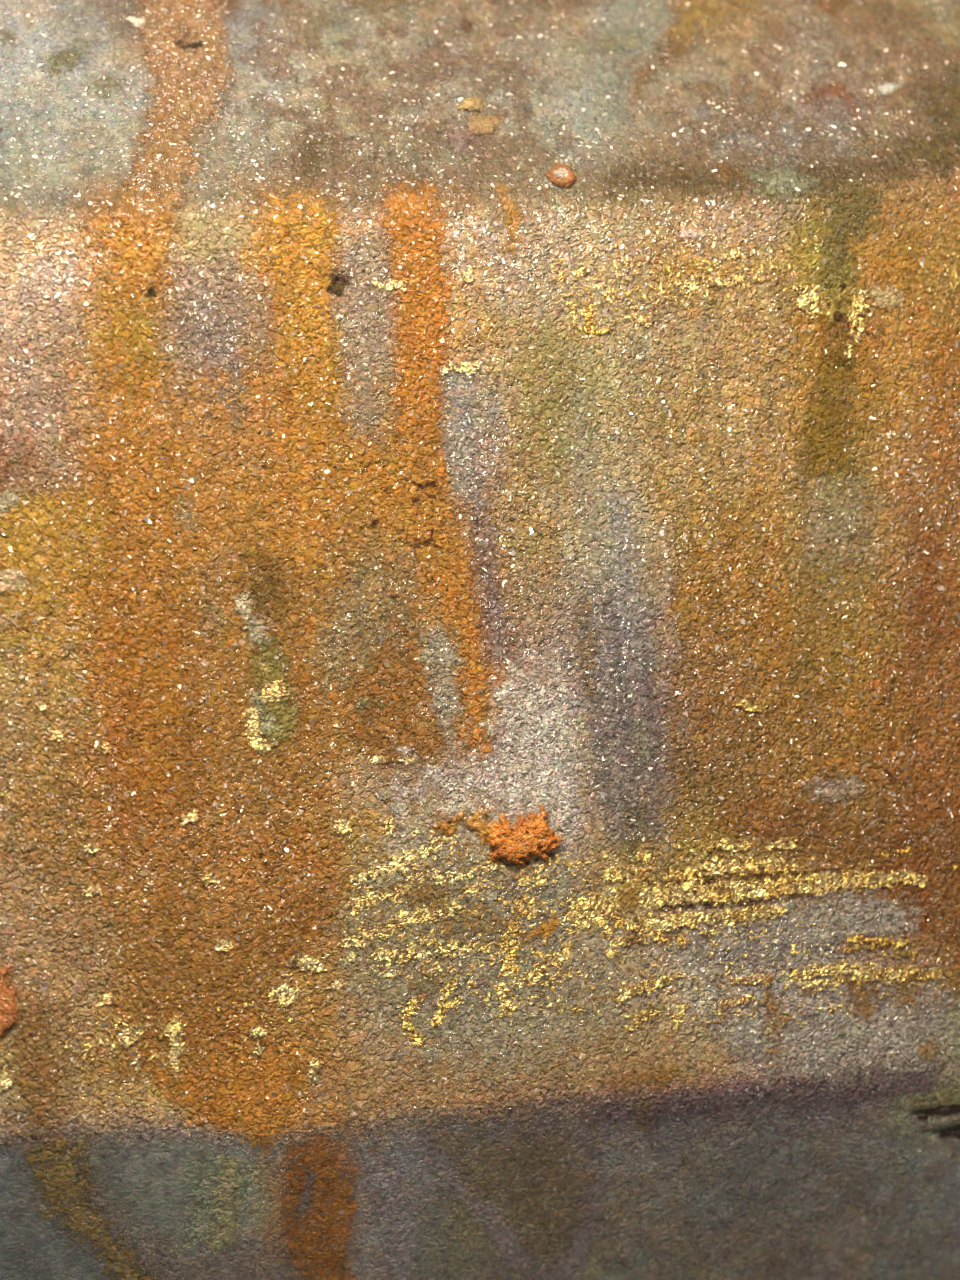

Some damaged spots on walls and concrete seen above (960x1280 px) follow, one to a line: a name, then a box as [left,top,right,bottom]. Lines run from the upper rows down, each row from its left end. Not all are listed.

damp [598,68,960,478]
rust [0,0,499,815]
rust [915,329,960,507]
peeling [59,957,340,1081]
peeling [335,829,952,1041]
rust [728,804,960,996]
rust [144,1028,734,1280]